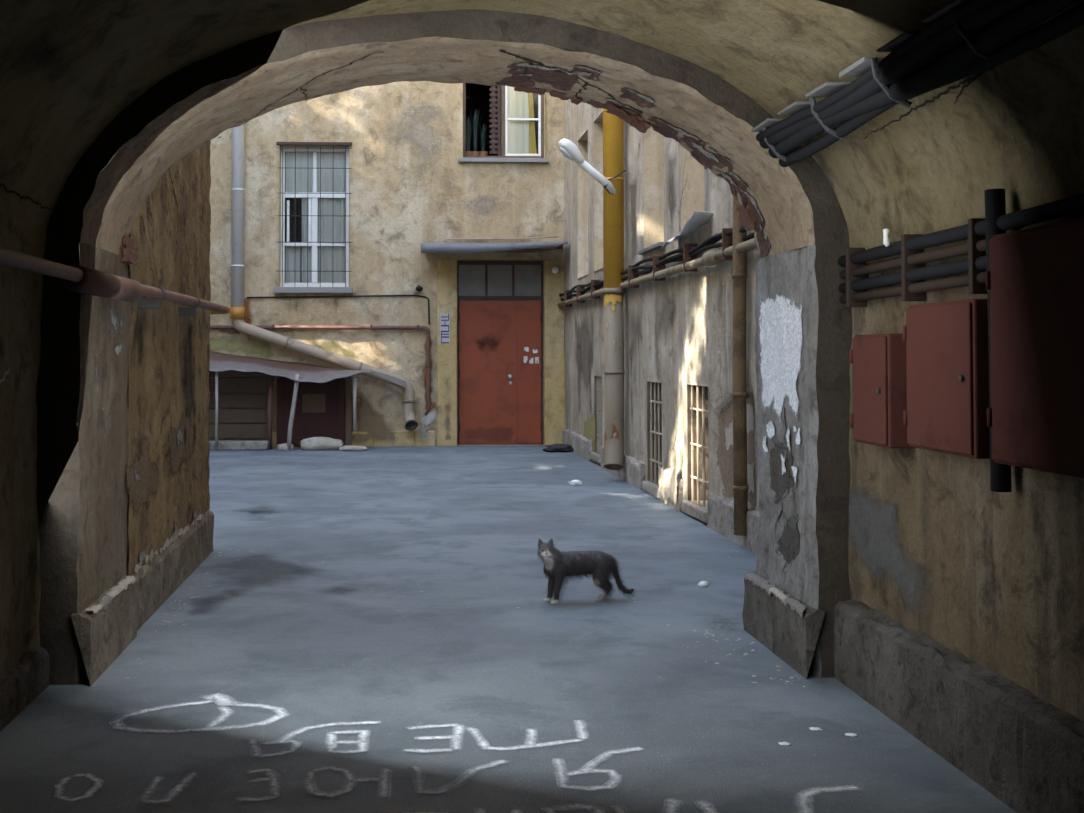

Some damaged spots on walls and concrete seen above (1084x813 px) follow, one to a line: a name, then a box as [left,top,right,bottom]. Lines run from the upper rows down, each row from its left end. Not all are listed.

flaking render [710,388,734,498]
peeling [746,294,802,510]
flaking render [86,507,210,614]